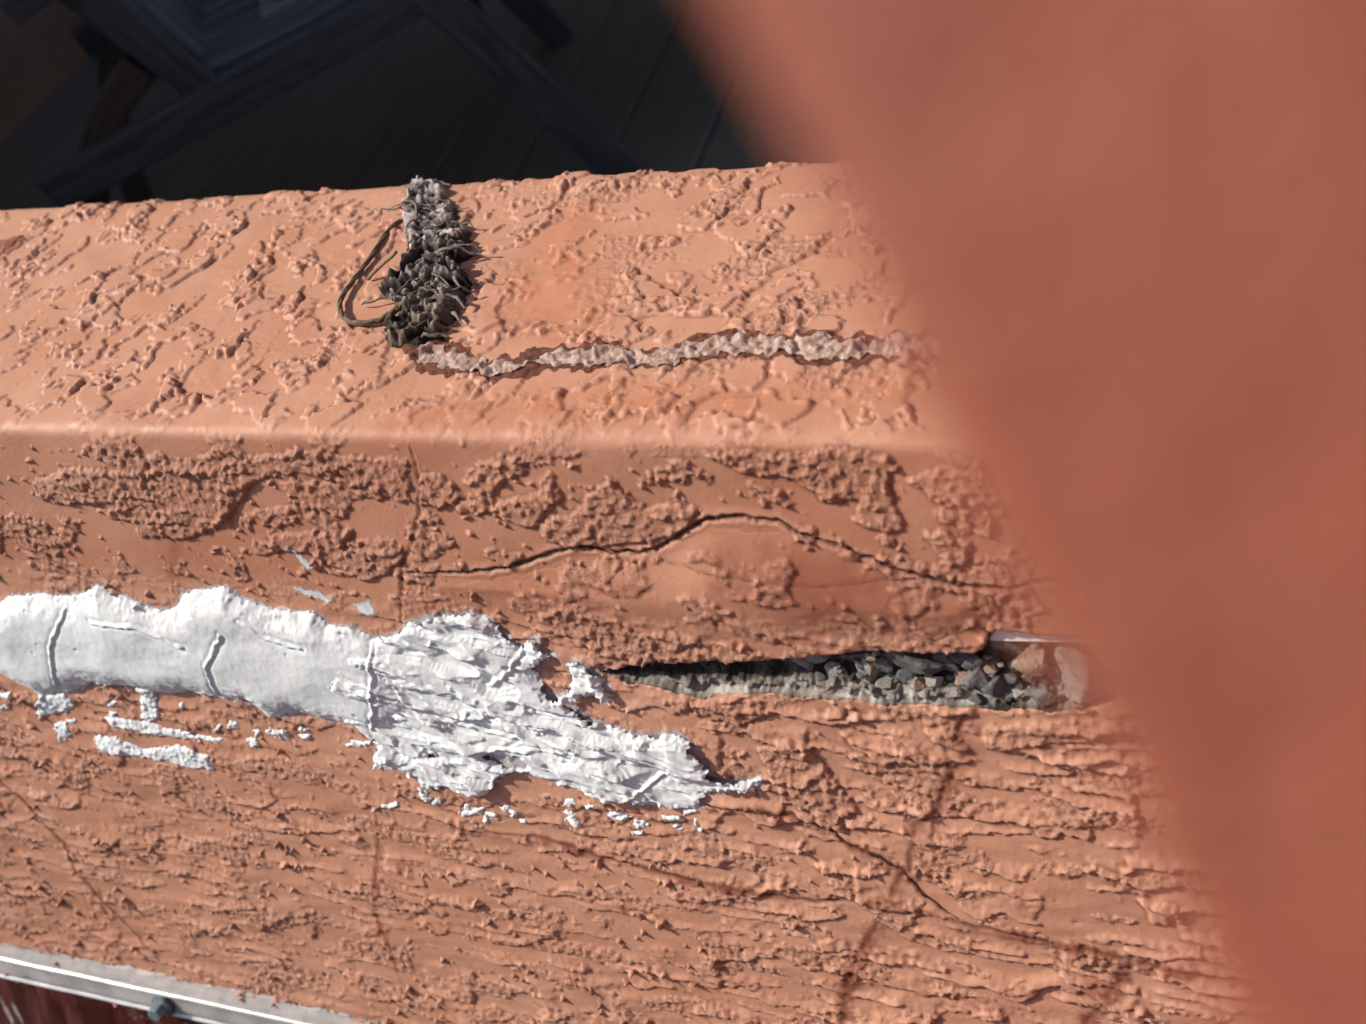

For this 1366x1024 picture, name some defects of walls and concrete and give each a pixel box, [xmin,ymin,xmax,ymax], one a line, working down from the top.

crack [401,328,896,385]
crack [401,515,1007,591]
spalling [538,605,1098,750]
crack [710,806,955,917]
crack [839,937,872,1020]